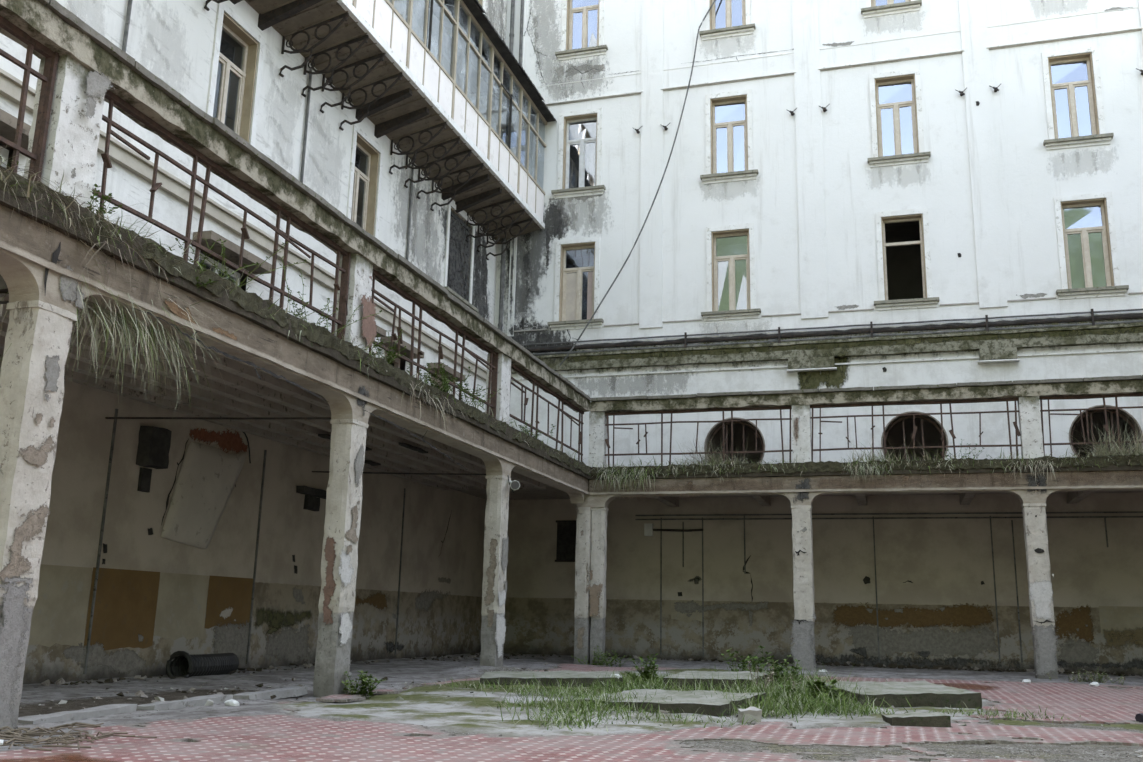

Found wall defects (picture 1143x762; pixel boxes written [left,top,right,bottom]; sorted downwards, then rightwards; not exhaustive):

leakage [439,207,490,320]
leakage [503,199,577,362]
peeling [17,355,60,467]
peeling [189,428,248,453]
peeling [354,445,364,487]
leakage [800,354,844,389]
peeling [0,502,51,732]
peeling [211,606,252,660]
peeling [322,501,397,646]
peeling [484,536,509,658]
leakage [816,647,1020,669]
leakage [1057,627,1143,670]